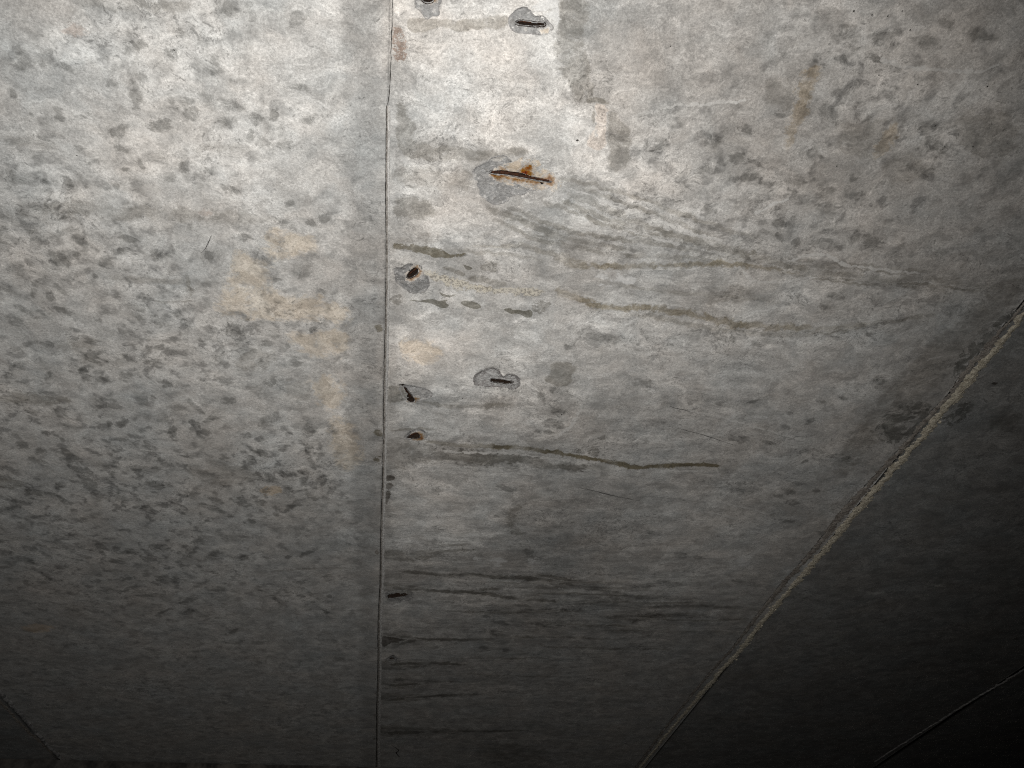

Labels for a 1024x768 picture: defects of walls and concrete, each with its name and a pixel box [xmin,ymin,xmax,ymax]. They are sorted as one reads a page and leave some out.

damp [70,0,196,16]
damp [215,0,259,25]
damp [283,10,309,29]
damp [0,29,722,524]
damp [72,538,224,599]